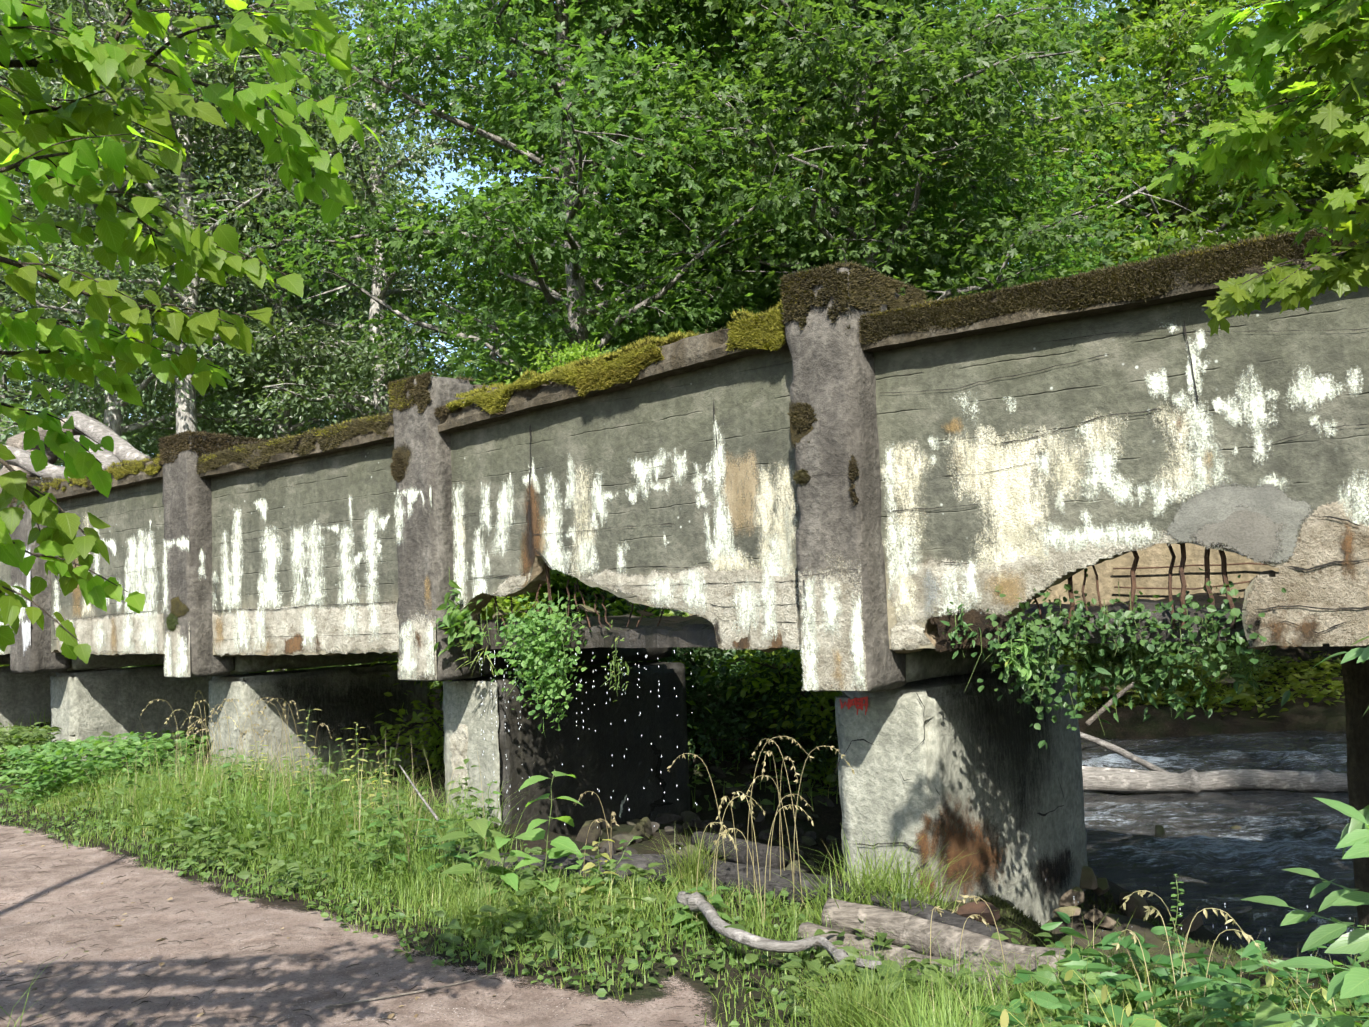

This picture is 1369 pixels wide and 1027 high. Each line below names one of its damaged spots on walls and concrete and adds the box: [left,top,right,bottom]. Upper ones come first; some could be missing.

efflorescence [82,487,432,618]
spalling [493,572,531,597]
efflorescence [453,421,798,607]
spalling [889,530,1178,652]
efflorescence [882,330,1362,596]
efflorescence [1340,479,1369,524]
corrosion [915,794,1007,902]